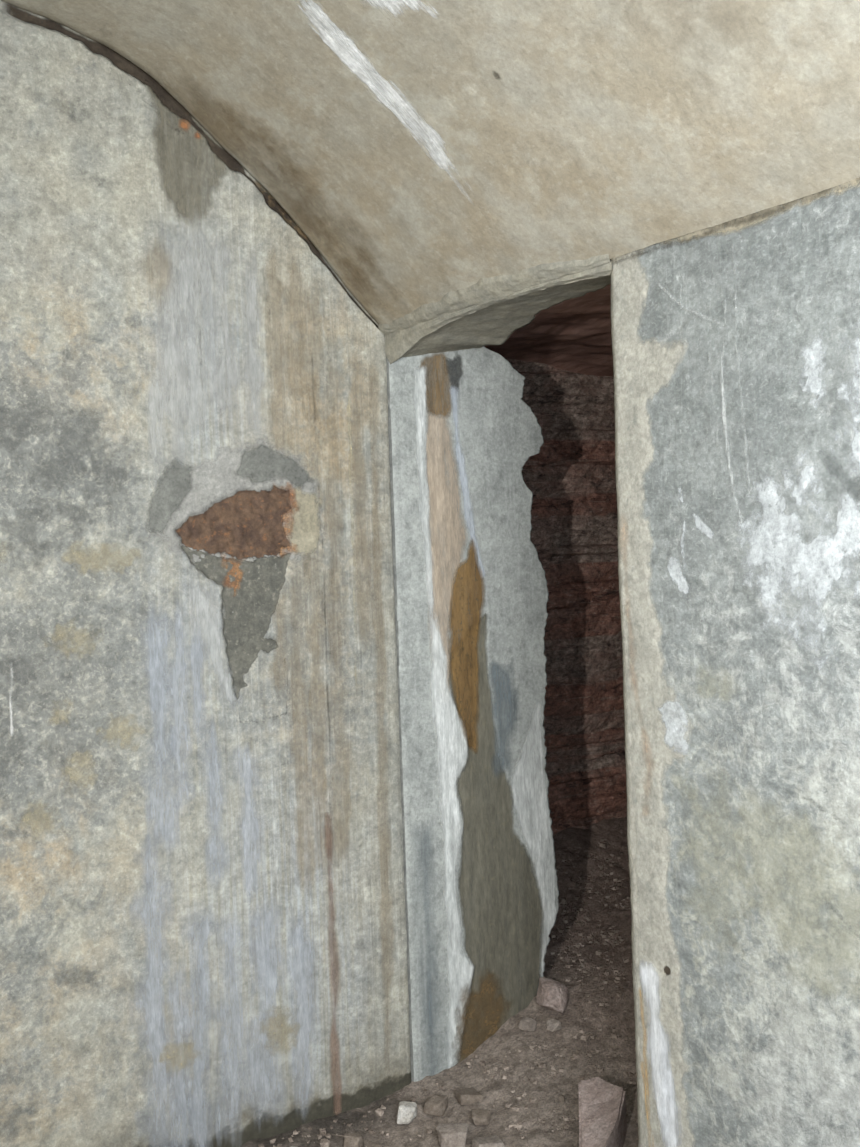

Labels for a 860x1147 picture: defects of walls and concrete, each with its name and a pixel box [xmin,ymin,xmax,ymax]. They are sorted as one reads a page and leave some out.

leakage [145,84,226,220]
leakage [299,0,453,168]
spalling [148,439,321,704]
leakage [629,782,678,1147]
corrosion [331,1025,341,1114]